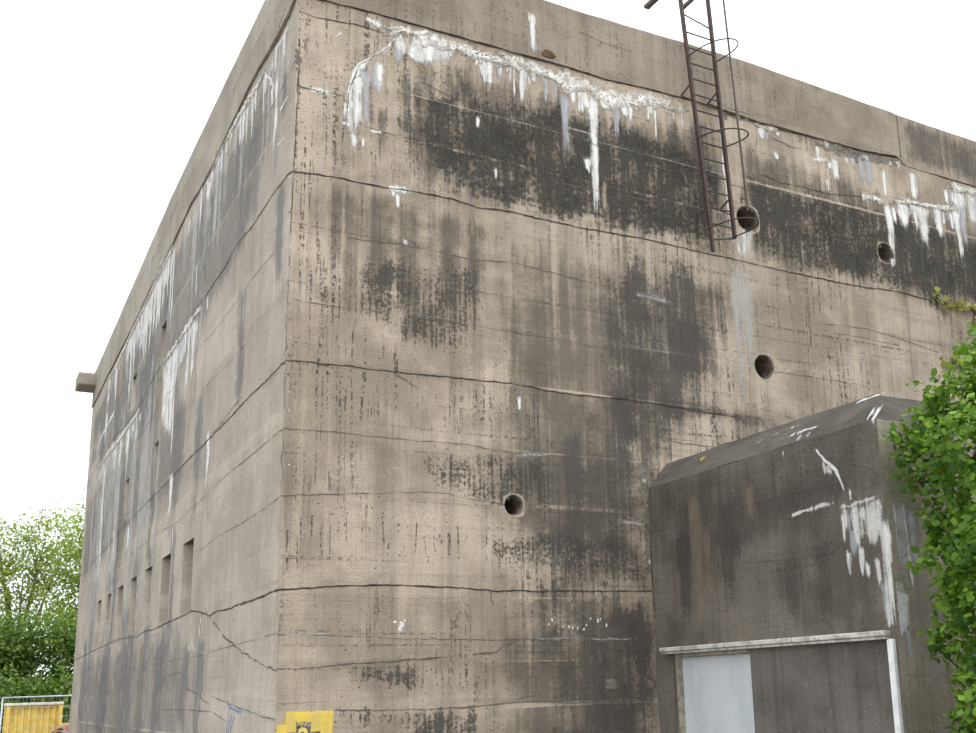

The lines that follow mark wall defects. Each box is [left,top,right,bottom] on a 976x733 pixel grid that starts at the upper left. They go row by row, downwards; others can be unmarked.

leakage [78,19,289,733]
leakage [361,199,483,358]
leakage [310,13,730,250]
leakage [737,122,976,301]
leakage [674,450,918,651]
leakage [506,592,653,733]